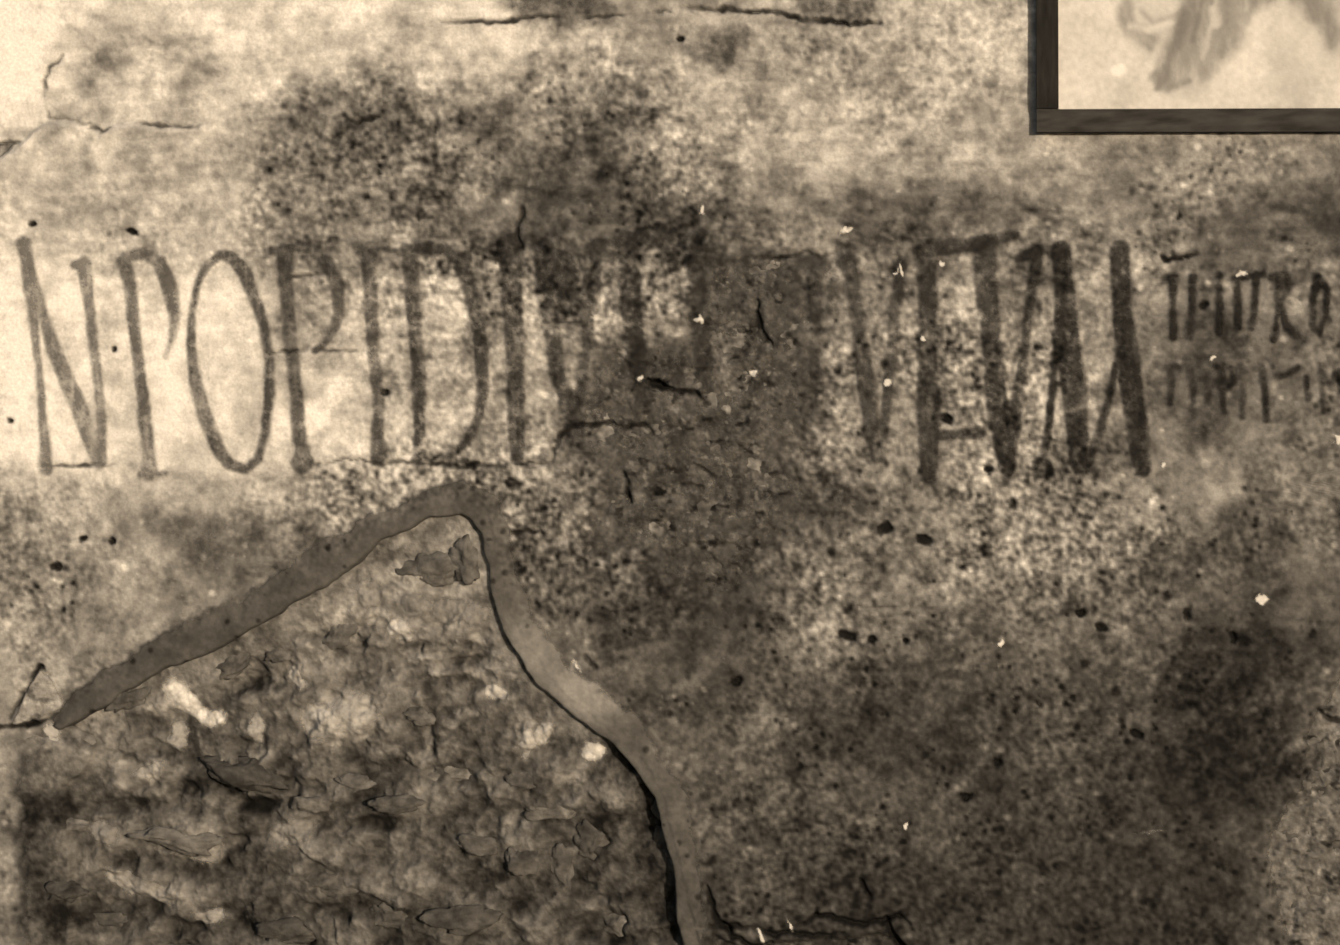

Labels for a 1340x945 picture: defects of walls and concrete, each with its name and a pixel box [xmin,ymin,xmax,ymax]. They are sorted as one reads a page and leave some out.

crack [475,16,534,24]
crack [722,10,870,26]
spalling [12,515,683,945]
crack [708,880,905,945]